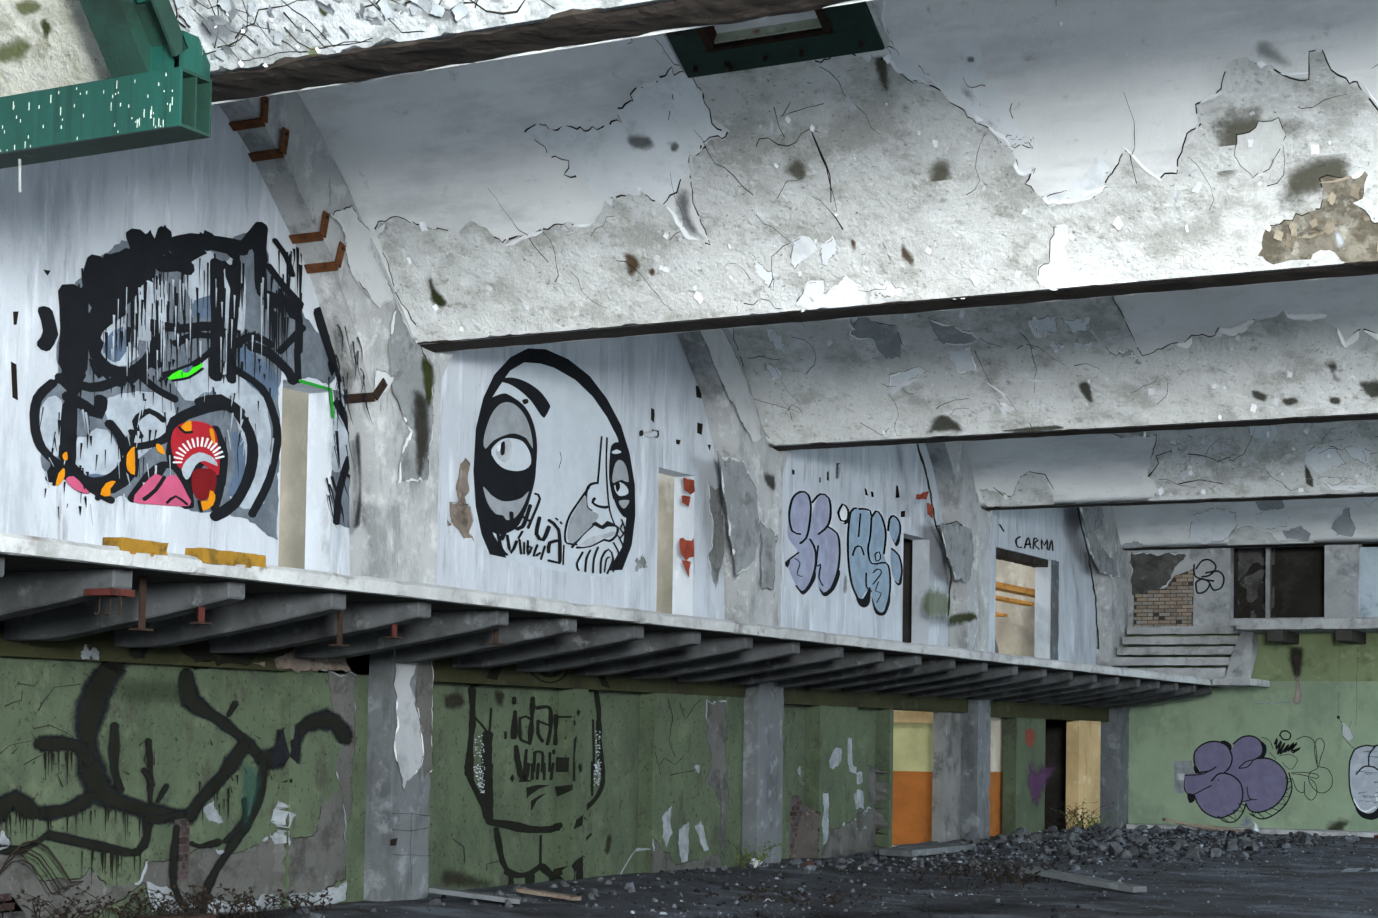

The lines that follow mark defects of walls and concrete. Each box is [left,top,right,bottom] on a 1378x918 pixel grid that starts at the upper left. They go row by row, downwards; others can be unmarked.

peeling [329,0,1378,546]
peeling [635,554,647,572]
peeling [679,451,778,592]
flaking render [1077,507,1194,649]
crack [0,682,81,765]
peeling [393,649,434,789]
peeling [391,813,431,881]